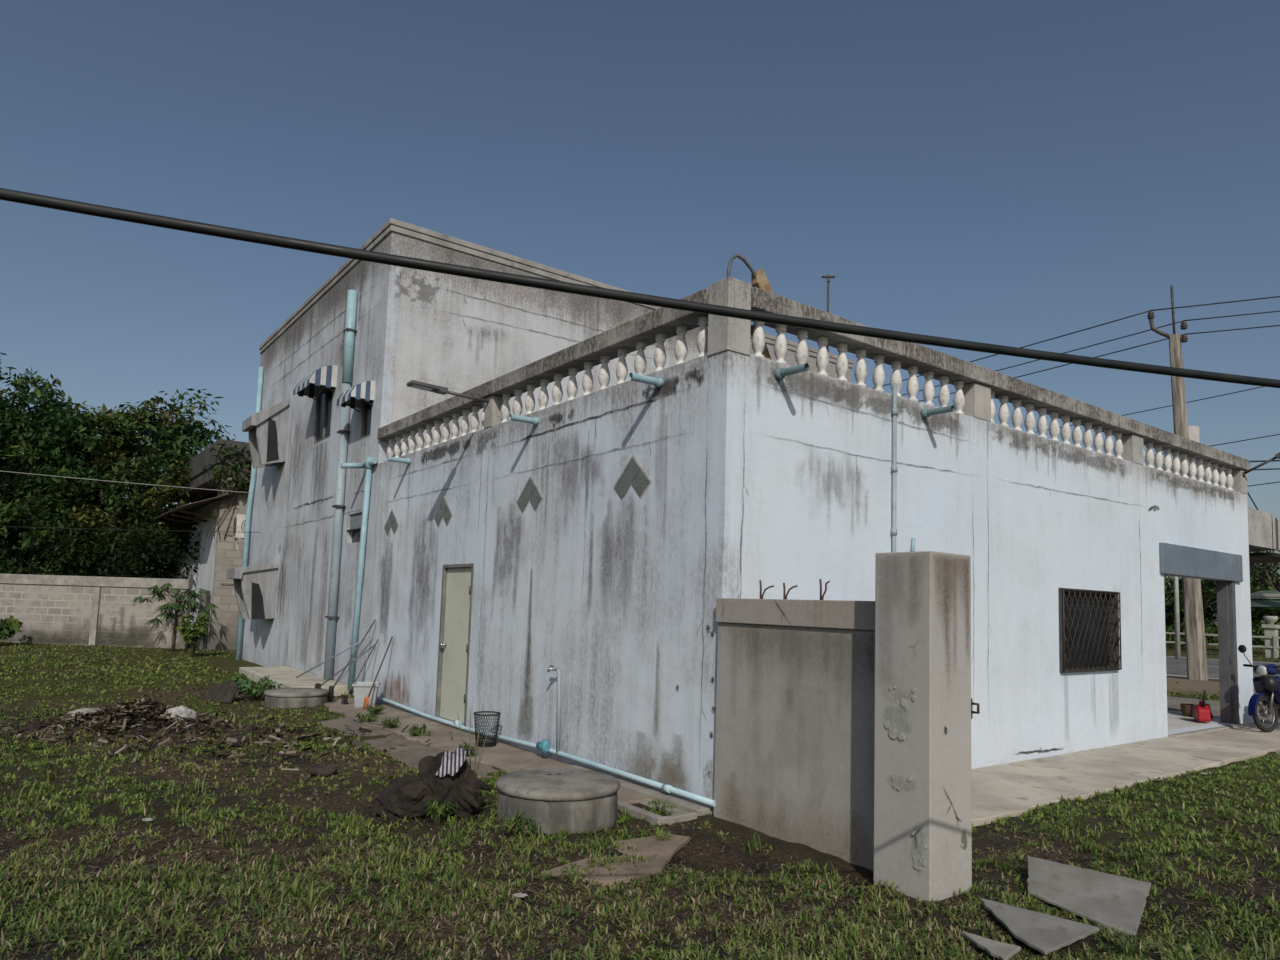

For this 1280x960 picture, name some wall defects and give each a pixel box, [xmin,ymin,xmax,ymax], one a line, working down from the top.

leakage [998,431,1116,470]
leakage [1153,474,1234,499]
leakage [637,758,685,789]